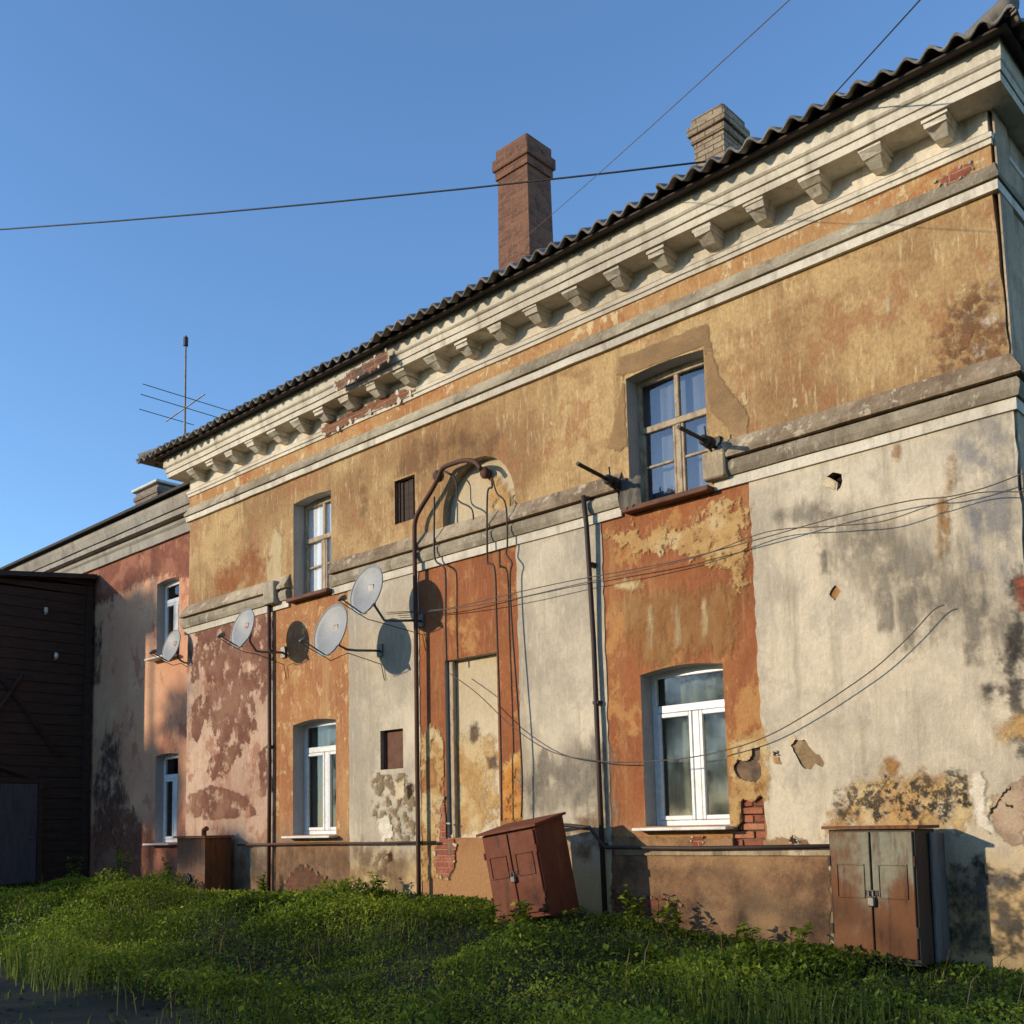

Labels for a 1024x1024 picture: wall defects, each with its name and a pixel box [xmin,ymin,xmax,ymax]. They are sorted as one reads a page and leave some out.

flaking render [333,348,390,391]
damp [937,269,1007,372]
peeling [603,497,752,593]
damp [777,502,832,526]
spalling [822,472,842,491]
damp [837,519,1024,755]
damp [93,735,127,842]
peeling [188,609,275,820]
peeling [370,724,523,881]
peeling [729,728,780,845]
spalling [788,736,824,770]
peeling [825,758,1024,846]